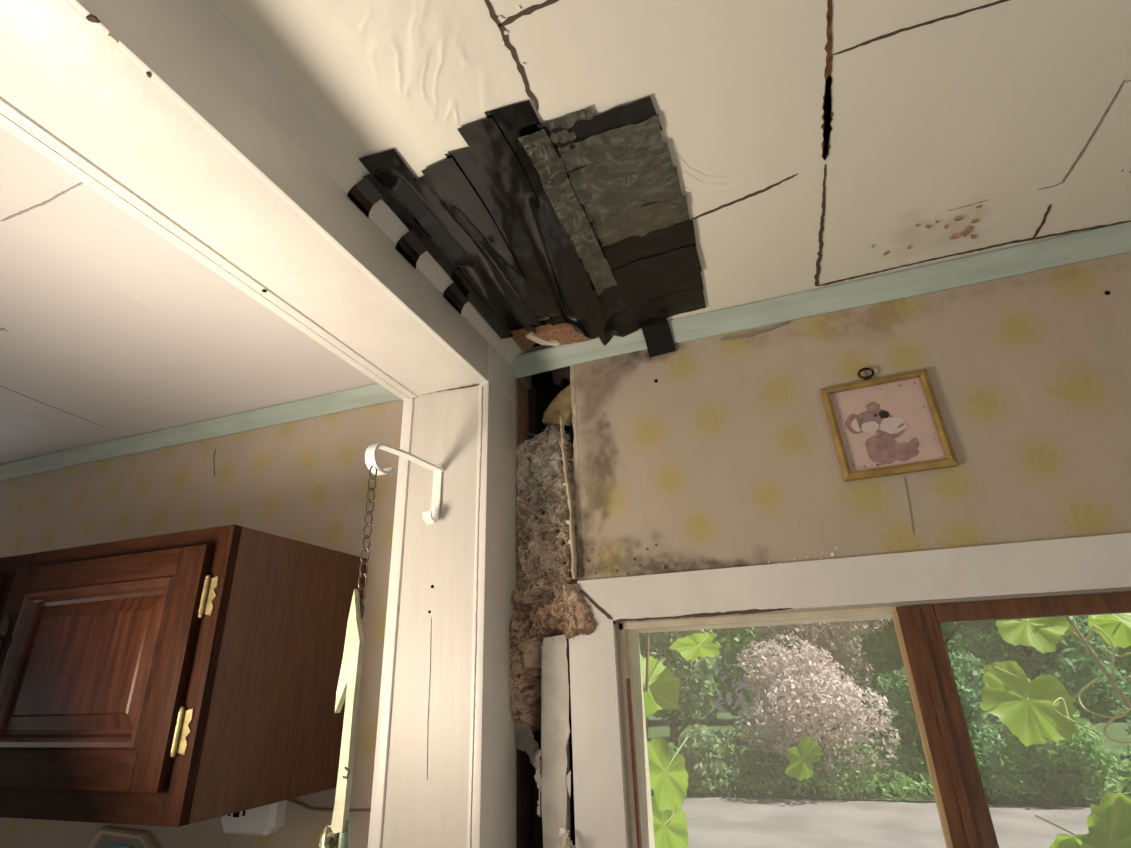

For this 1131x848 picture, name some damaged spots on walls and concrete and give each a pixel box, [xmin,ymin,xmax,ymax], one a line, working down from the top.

crack [484,0,559,111]
crack [0,182,83,222]
crack [693,0,1131,286]
crack [1,386,106,428]
spalling [516,365,584,581]
spalling [517,730,543,848]